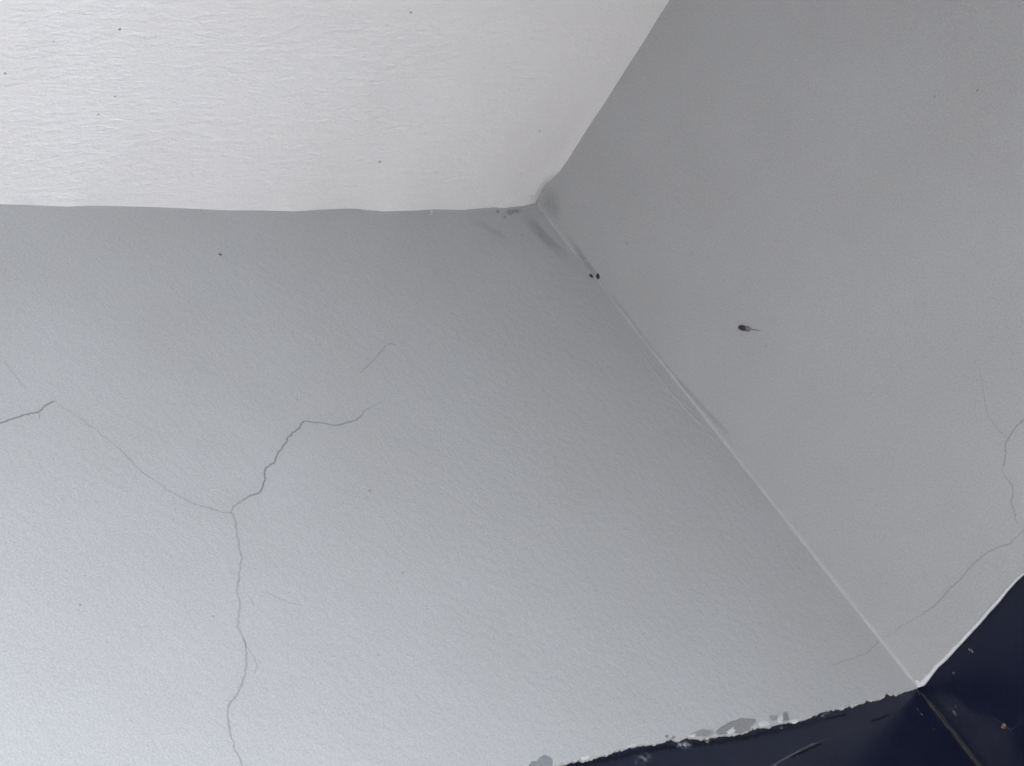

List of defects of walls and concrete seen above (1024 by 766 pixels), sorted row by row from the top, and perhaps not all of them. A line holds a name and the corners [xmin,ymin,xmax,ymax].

peeling [716,712,799,735]
peeling [529,755,553,766]